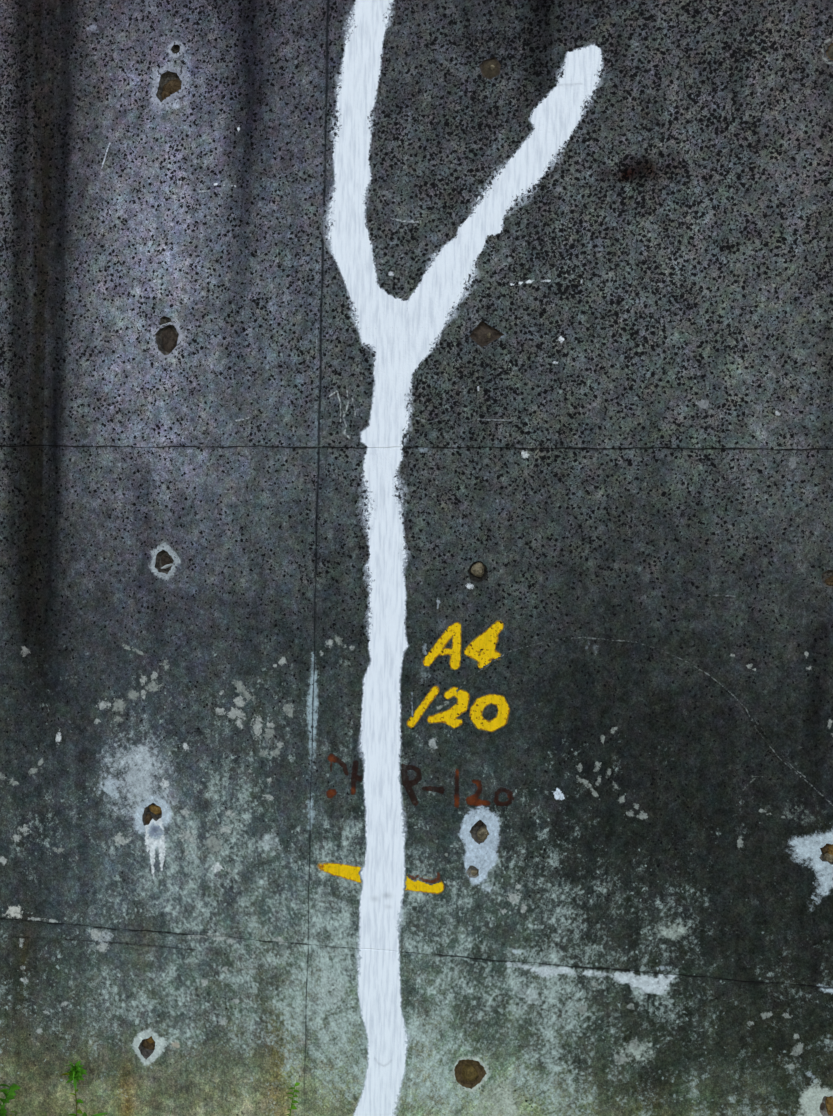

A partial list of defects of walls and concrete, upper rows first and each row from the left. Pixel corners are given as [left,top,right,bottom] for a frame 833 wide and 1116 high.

damp [306,0,353,592]
damp [0,0,326,1056]
damp [405,624,441,733]
damp [407,871,441,885]
damp [453,804,504,898]
crack [456,636,833,806]
damp [758,617,833,915]
damp [197,891,364,1075]
damp [401,913,706,1116]
damp [790,1057,833,1116]
damp [813,980,833,996]